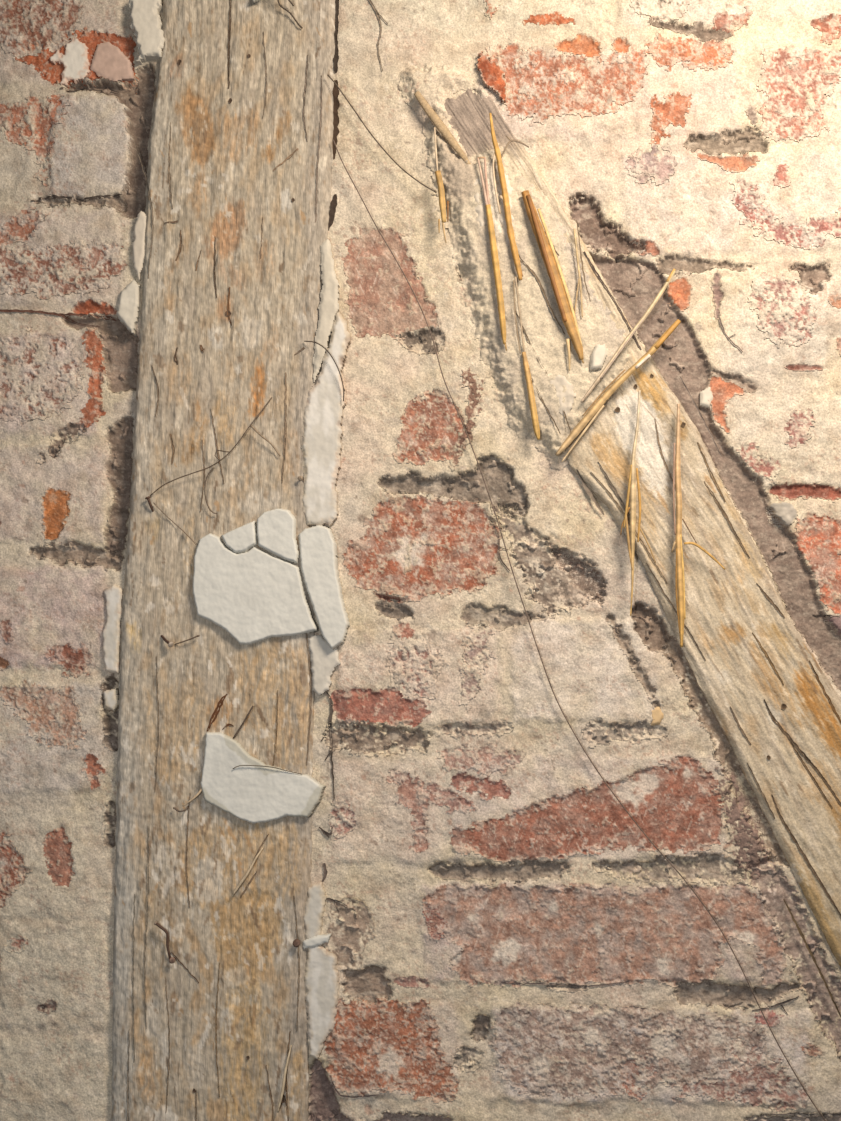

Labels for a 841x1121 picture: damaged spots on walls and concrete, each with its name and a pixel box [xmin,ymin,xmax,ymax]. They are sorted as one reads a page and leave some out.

peeling [477,5,753,186]
spalling [392,388,468,466]
spalling [343,494,502,604]
spalling [386,602,841,1112]
spalling [308,976,460,1121]